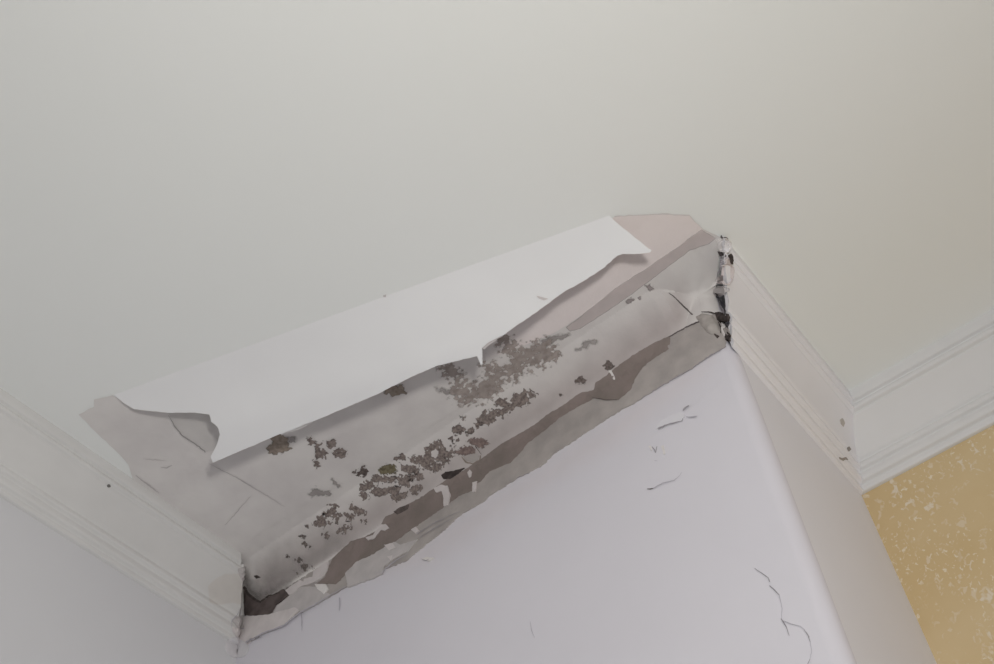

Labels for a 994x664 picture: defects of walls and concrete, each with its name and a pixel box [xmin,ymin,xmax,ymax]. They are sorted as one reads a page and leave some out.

damp [435,334,569,407]
damp [309,478,340,496]
peeling [79,213,735,644]
damp [359,347,732,591]
crack [756,569,812,663]